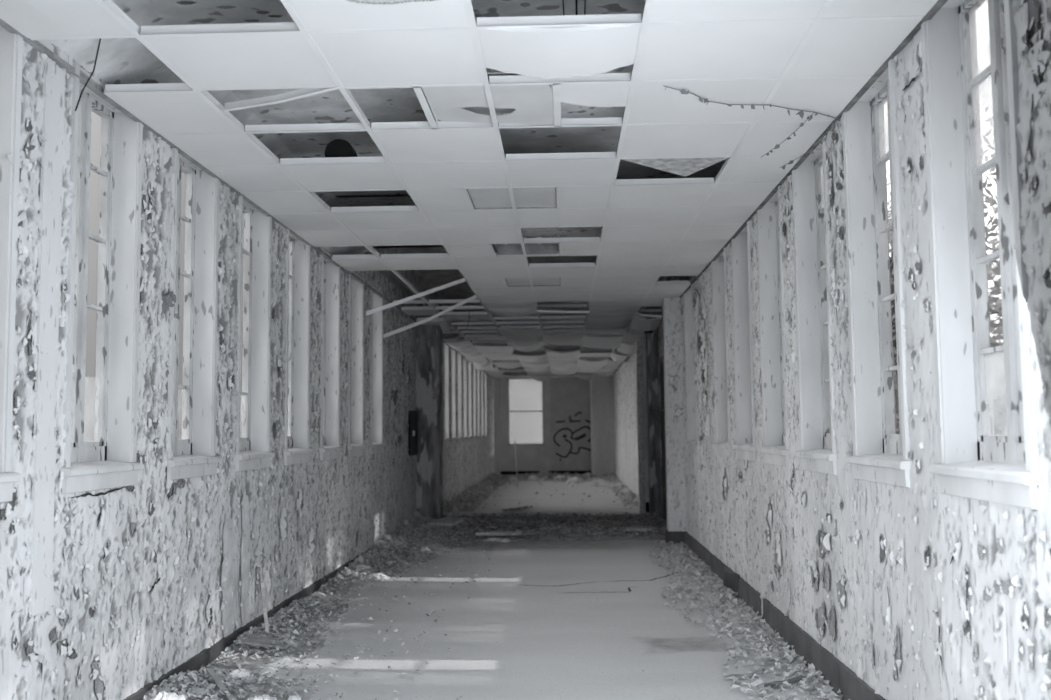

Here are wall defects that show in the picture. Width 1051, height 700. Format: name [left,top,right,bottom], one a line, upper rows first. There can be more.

peeling [7,53,73,463]
peeling [826,124,846,267]
peeling [898,95,926,187]
peeling [901,235,933,369]
peeling [1018,148,1051,255]
peeling [445,472,639,511]
peeling [649,264,1051,700]